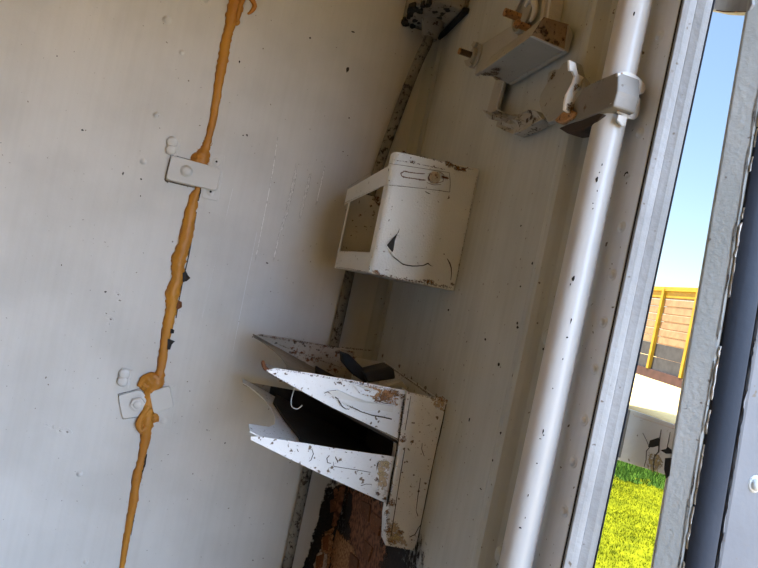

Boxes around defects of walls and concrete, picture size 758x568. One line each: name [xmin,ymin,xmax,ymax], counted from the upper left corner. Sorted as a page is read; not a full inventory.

crack [176,246,191,318]